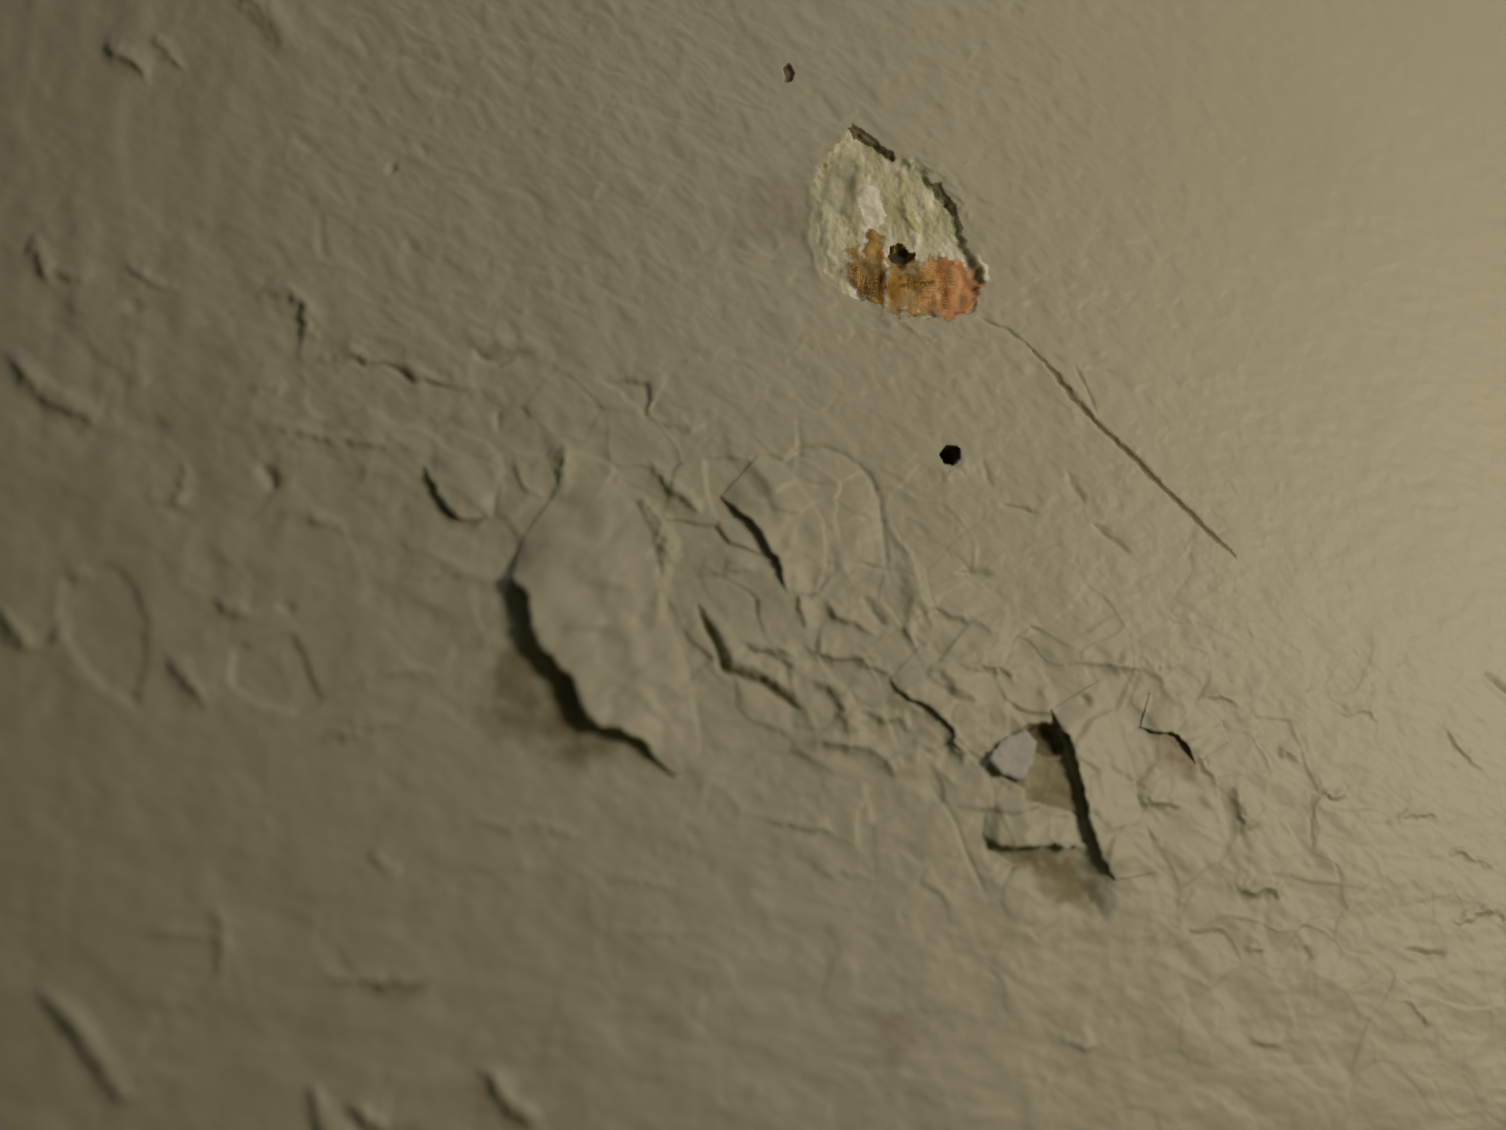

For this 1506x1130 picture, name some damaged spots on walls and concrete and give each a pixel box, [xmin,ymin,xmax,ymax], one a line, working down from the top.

spalling [791,123,989,354]
crack [977,314,1237,559]
crack [697,604,804,710]
peeling [255,403,1269,919]